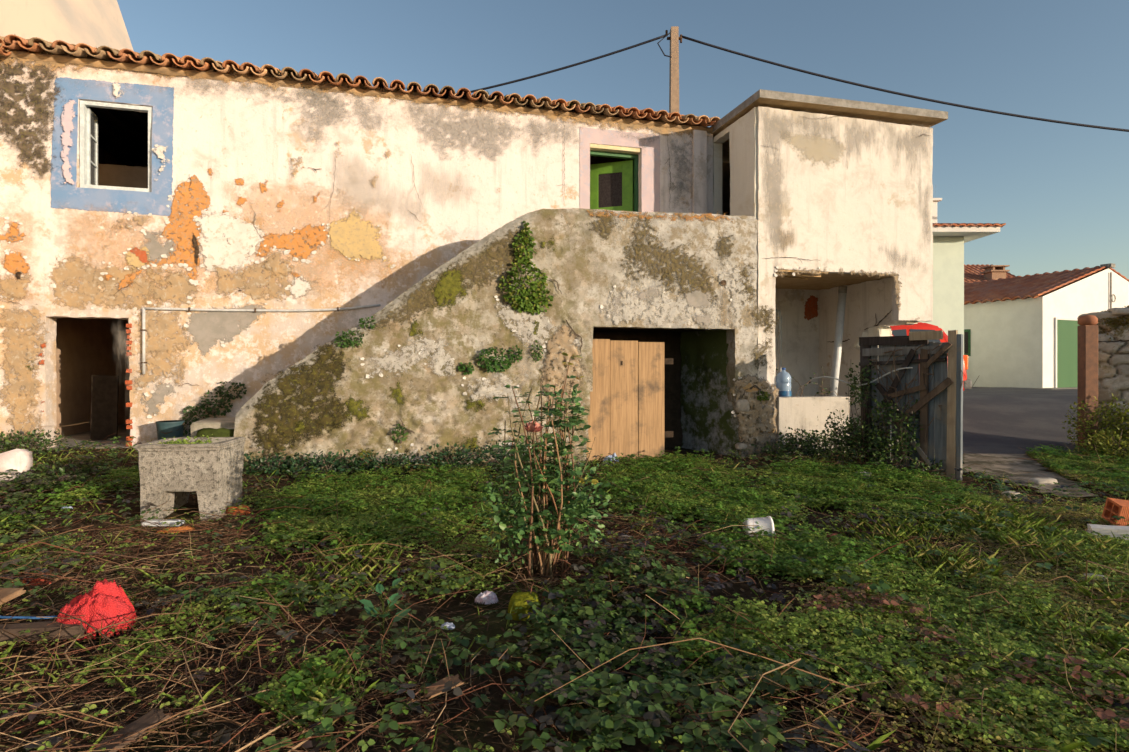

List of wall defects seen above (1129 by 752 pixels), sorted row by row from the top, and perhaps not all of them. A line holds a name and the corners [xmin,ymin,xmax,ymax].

peeling [290,156,306,179]
water stain [0,49,694,197]
peeling [0,216,49,442]
peeling [49,168,396,418]
spalling [774,266,907,322]
spalling [853,326,892,350]